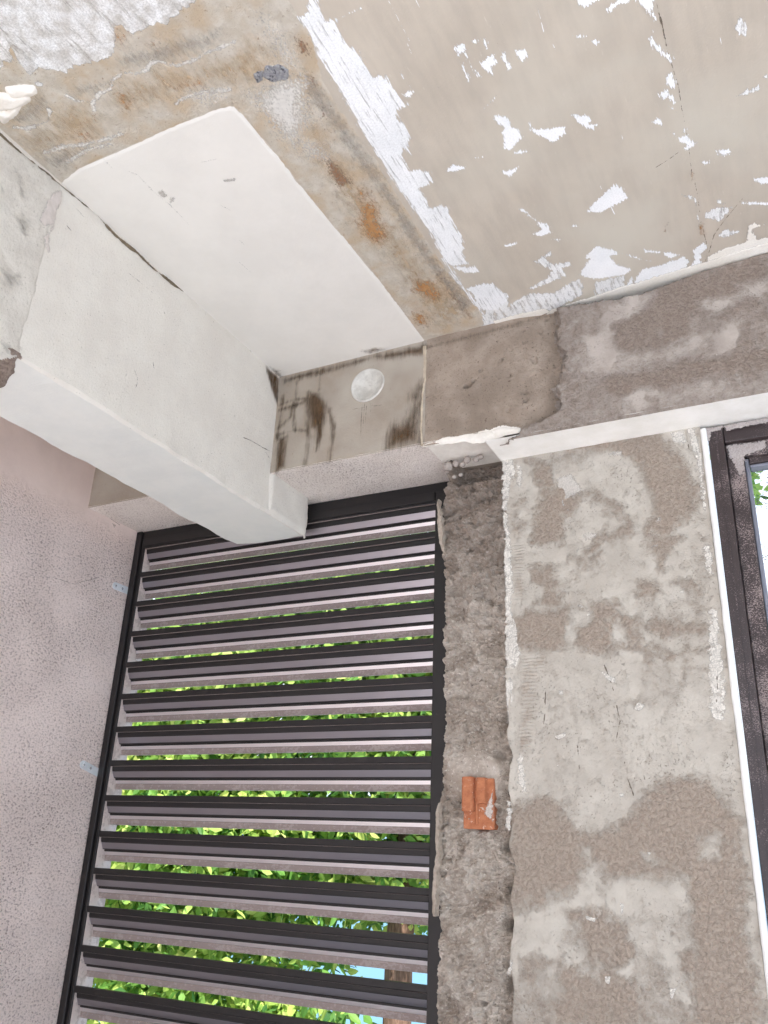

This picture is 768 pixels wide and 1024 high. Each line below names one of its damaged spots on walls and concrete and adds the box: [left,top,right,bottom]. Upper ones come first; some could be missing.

rust [326,158,386,240]
spalling [0,0,768,446]
damp [371,346,423,358]
damp [276,435,286,471]
damp [267,369,334,438]
damp [389,397,416,447]